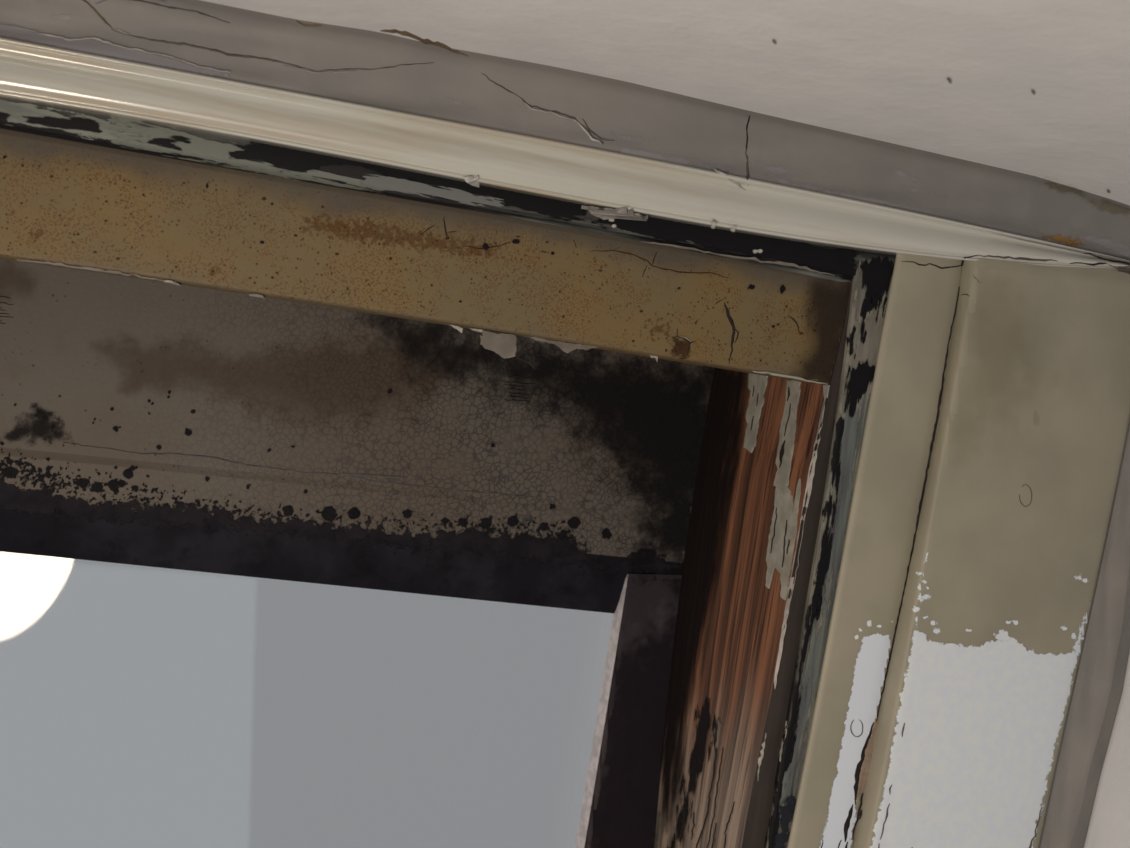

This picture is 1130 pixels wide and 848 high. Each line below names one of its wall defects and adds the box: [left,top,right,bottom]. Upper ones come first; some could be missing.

crack [82,0,615,145]
crack [714,115,750,190]
crack [574,242,739,363]
peeling [0,99,894,848]
leakage [0,316,745,848]